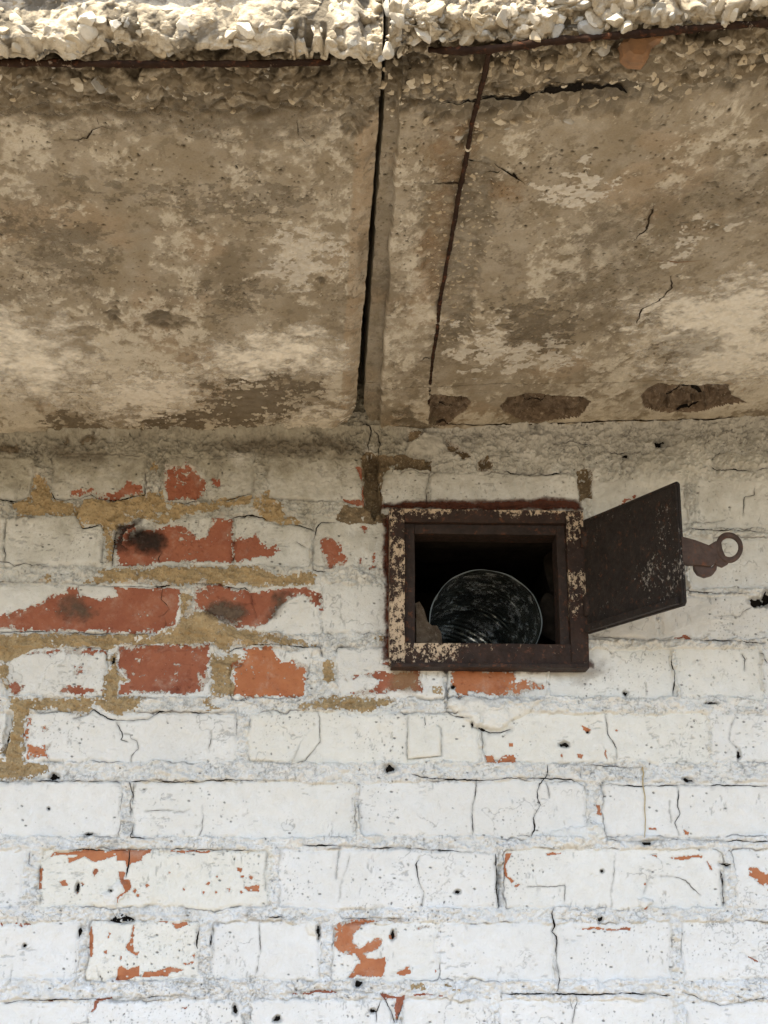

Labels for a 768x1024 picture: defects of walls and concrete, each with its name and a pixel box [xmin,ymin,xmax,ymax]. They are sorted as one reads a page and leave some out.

crack [439,82,627,105]
spalling [0,0,768,357]
water stain [480,297,586,359]
water stain [38,395,111,446]
water stain [127,371,356,431]
peeling [0,452,545,782]
corrosion [380,497,583,660]
peeling [50,849,152,903]
crack [77,709,276,891]
crack [307,716,768,907]
peeling [332,918,461,1020]
crack [505,885,763,1022]